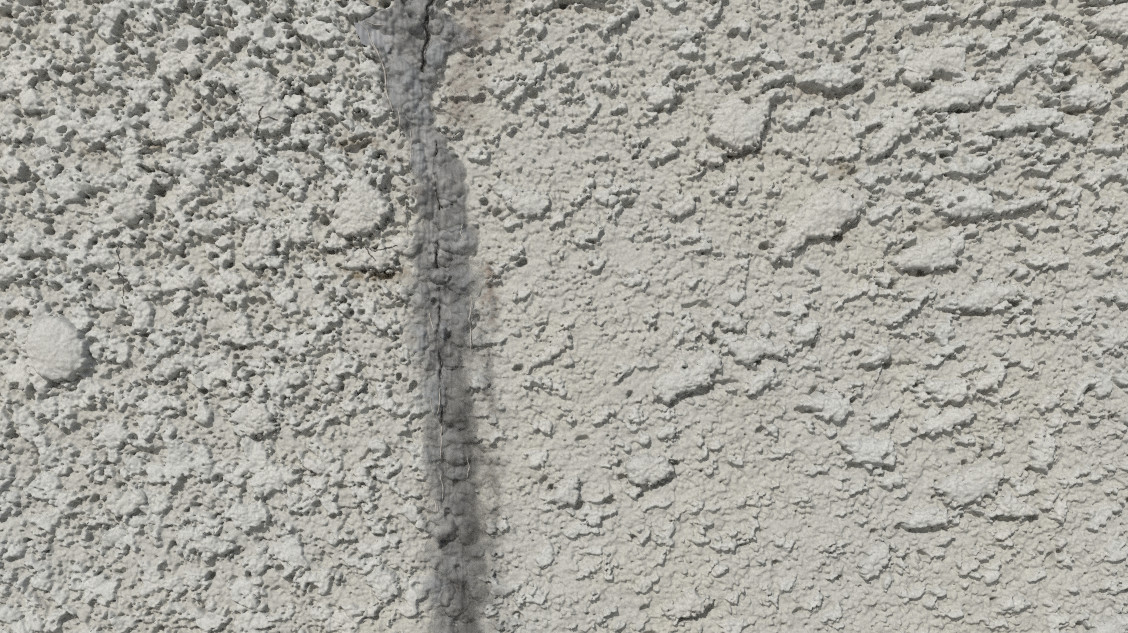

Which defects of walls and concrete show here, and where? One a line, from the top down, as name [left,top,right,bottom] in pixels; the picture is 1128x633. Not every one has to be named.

crack [421,0,434,70]